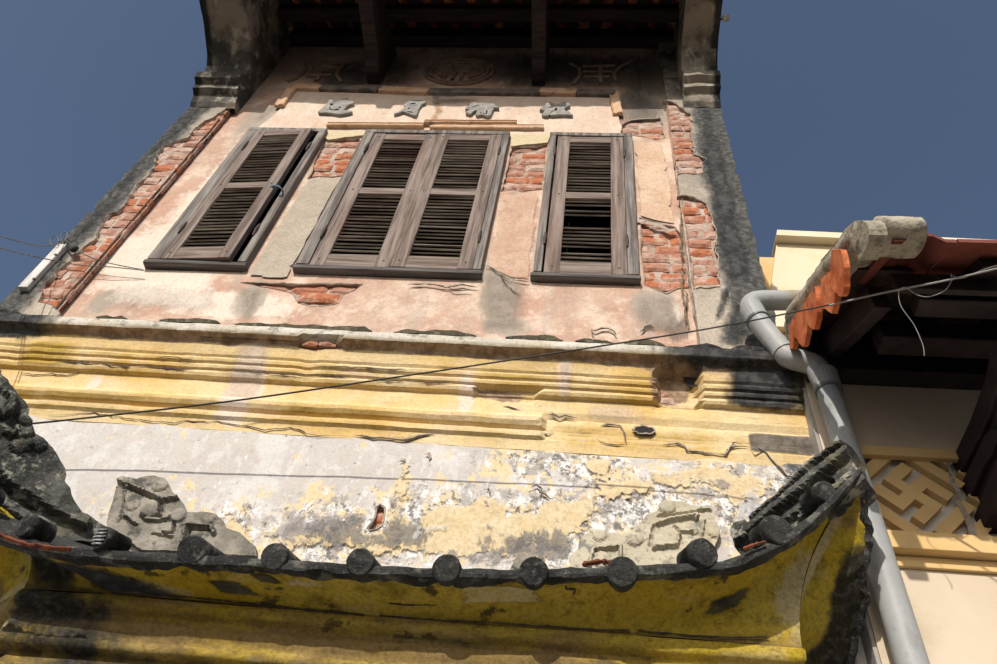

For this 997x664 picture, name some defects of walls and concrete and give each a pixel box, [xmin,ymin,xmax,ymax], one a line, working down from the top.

spalling [38,110,230,313]
spalling [241,282,363,307]
spalling [307,138,360,179]
peeling [489,145,557,278]
spalling [621,100,721,294]
leakage [665,109,793,410]
flaking render [657,392,674,408]
peeling [268,459,771,566]